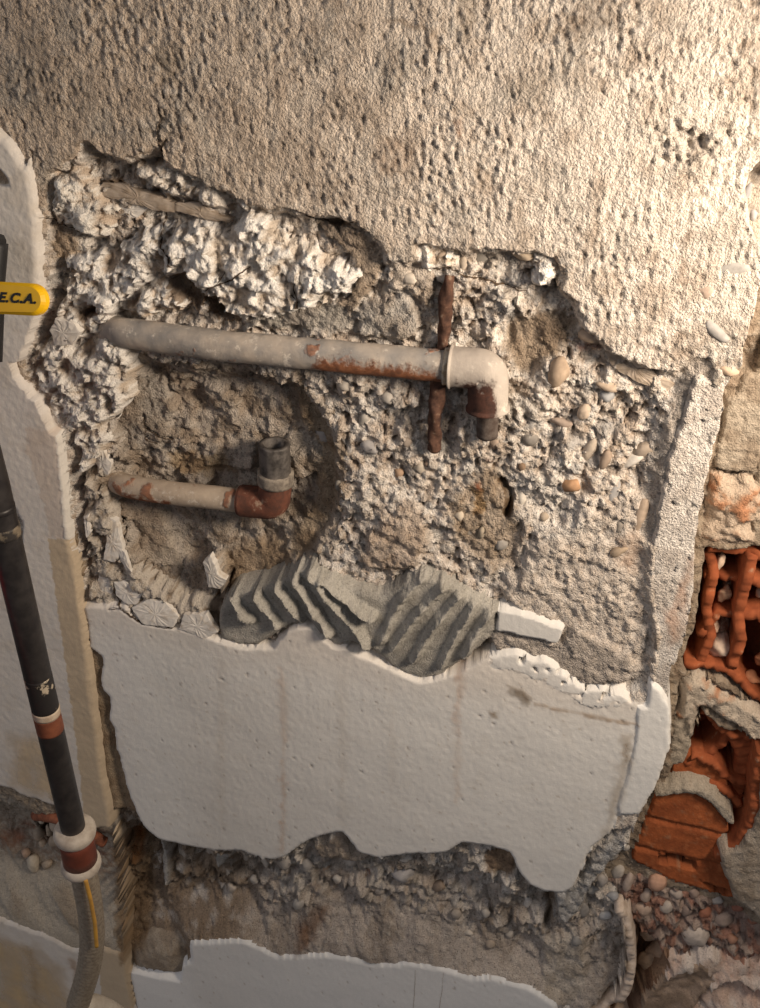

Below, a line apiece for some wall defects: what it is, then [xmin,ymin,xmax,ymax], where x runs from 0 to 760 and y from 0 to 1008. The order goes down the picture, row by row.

crack [157,110,165,160]
hole [628,109,742,178]
spalling [745,162,760,240]
corrosion [437,275,455,350]
spalling [17,141,689,708]
corrosion [427,381,446,454]
spalling [93,650,636,1008]
spalling [0,786,79,948]
spalling [665,944,760,1008]